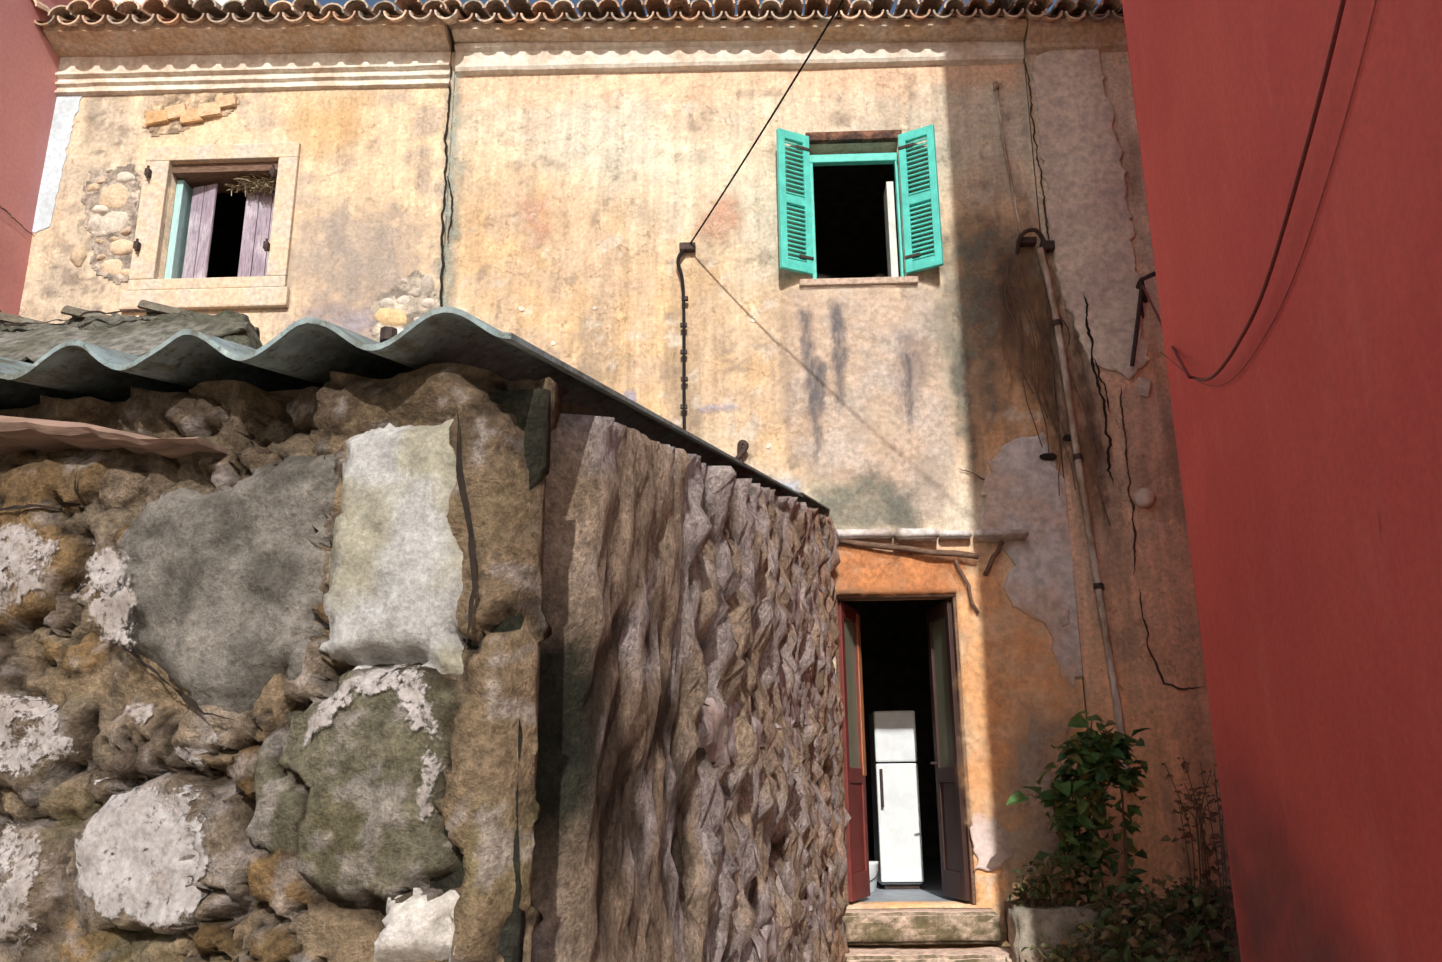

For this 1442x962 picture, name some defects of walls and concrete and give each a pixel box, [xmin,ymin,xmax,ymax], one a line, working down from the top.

spalling [70,164,141,284]
crack [439,66,453,307]
spalling [369,270,440,342]
leakage [800,304,846,449]
crack [1083,294,1205,690]
peeling [787,431,1083,817]
peeling [697,661,823,773]
peeling [752,866,843,962]